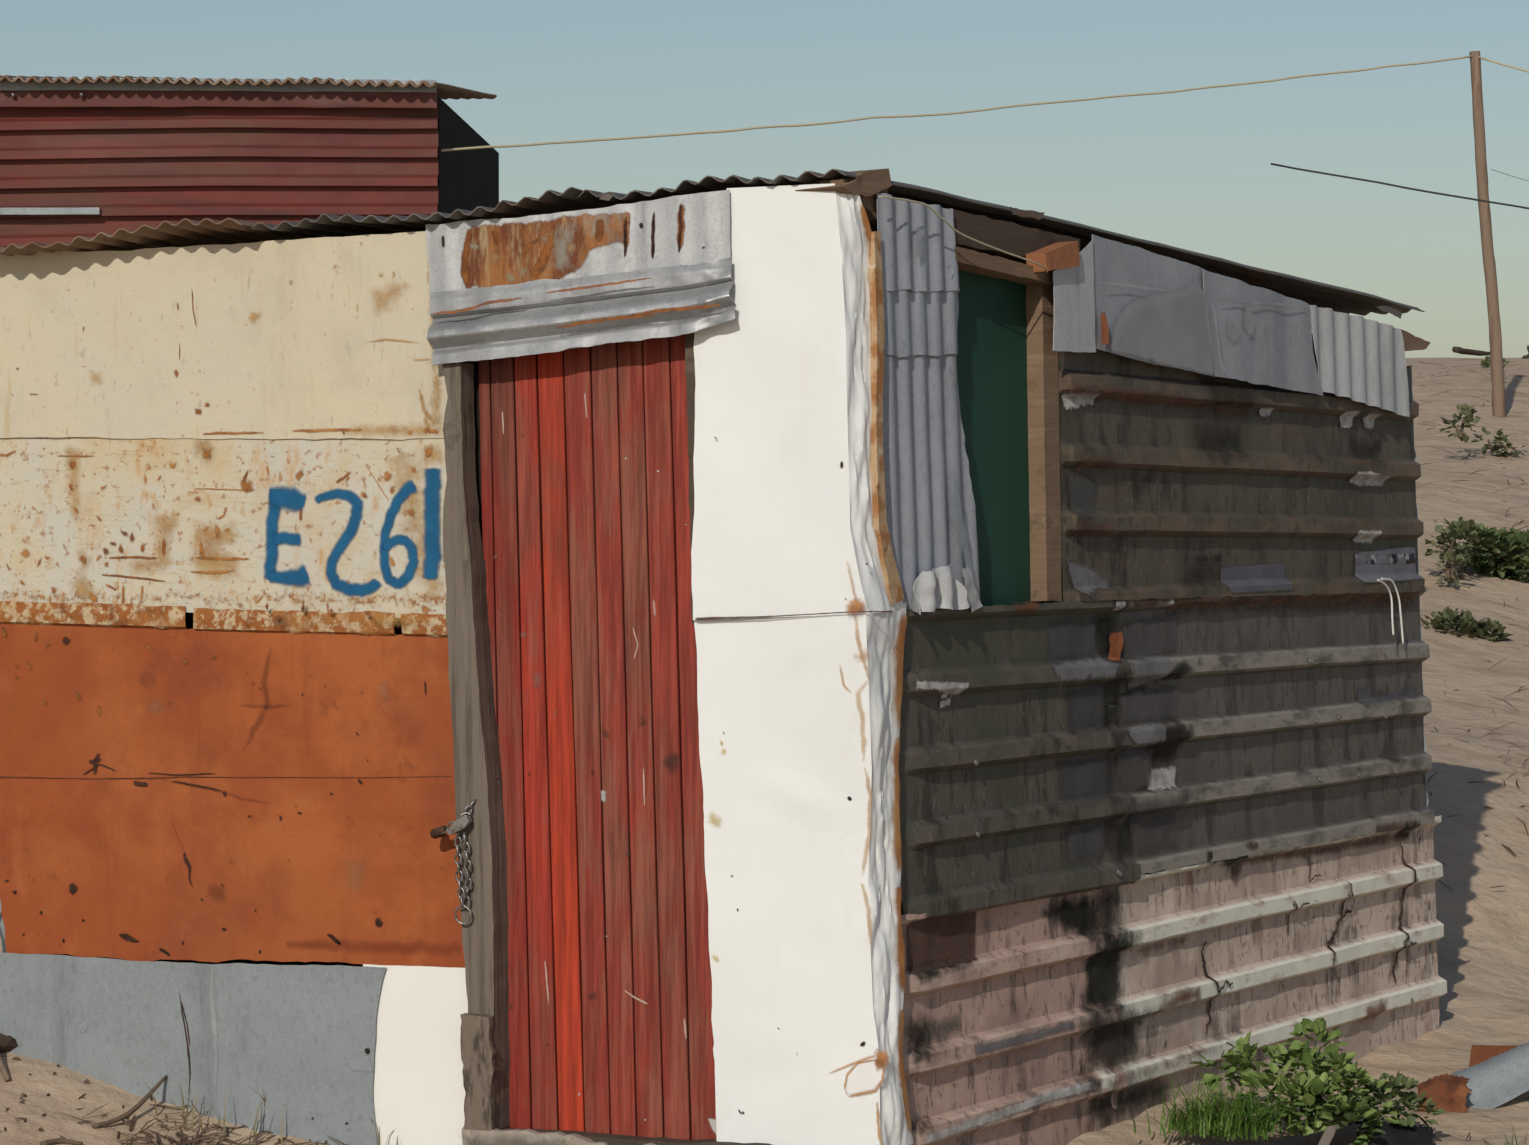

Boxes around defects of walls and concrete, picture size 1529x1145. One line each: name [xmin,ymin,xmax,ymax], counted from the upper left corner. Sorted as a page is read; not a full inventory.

rust [432,212,650,315]
rust [677,204,685,248]
rust [60,452,93,490]
rust [3,521,209,605]
rust [191,466,269,574]
rust [200,431,263,458]
rust [227,579,443,623]
rust [293,376,439,516]
crack [1287,856,1354,967]
crack [1392,842,1417,983]
water stain [1044,891,1150,1087]
crack [1201,942,1233,1036]